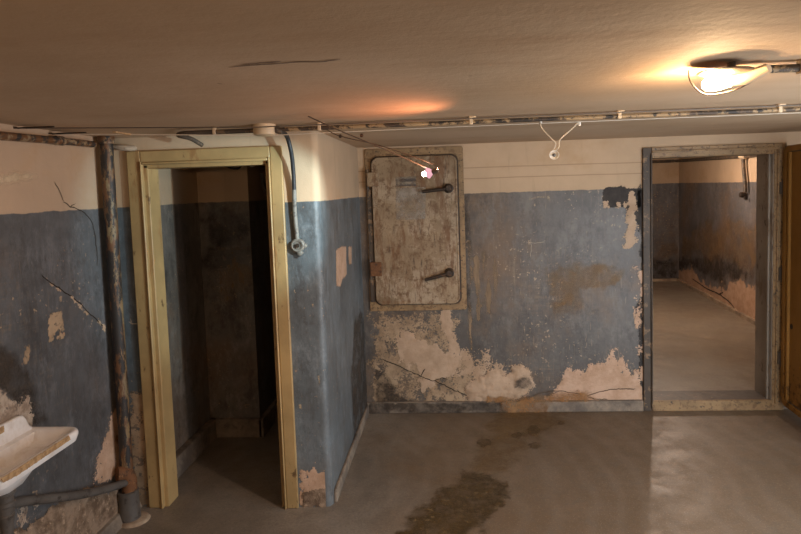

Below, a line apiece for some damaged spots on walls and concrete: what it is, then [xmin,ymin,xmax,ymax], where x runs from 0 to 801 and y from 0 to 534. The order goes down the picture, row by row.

crack [55,183,98,262]
peeling [603,191,639,250]
leakage [602,186,642,270]
crack [42,275,106,332]
crack [693,279,734,308]
crack [383,359,467,396]
peeling [366,310,507,402]
peeling [544,348,643,400]
leakage [635,283,643,395]
flaking render [0,390,35,434]
flaking render [14,401,121,534]
leakage [396,473,510,534]